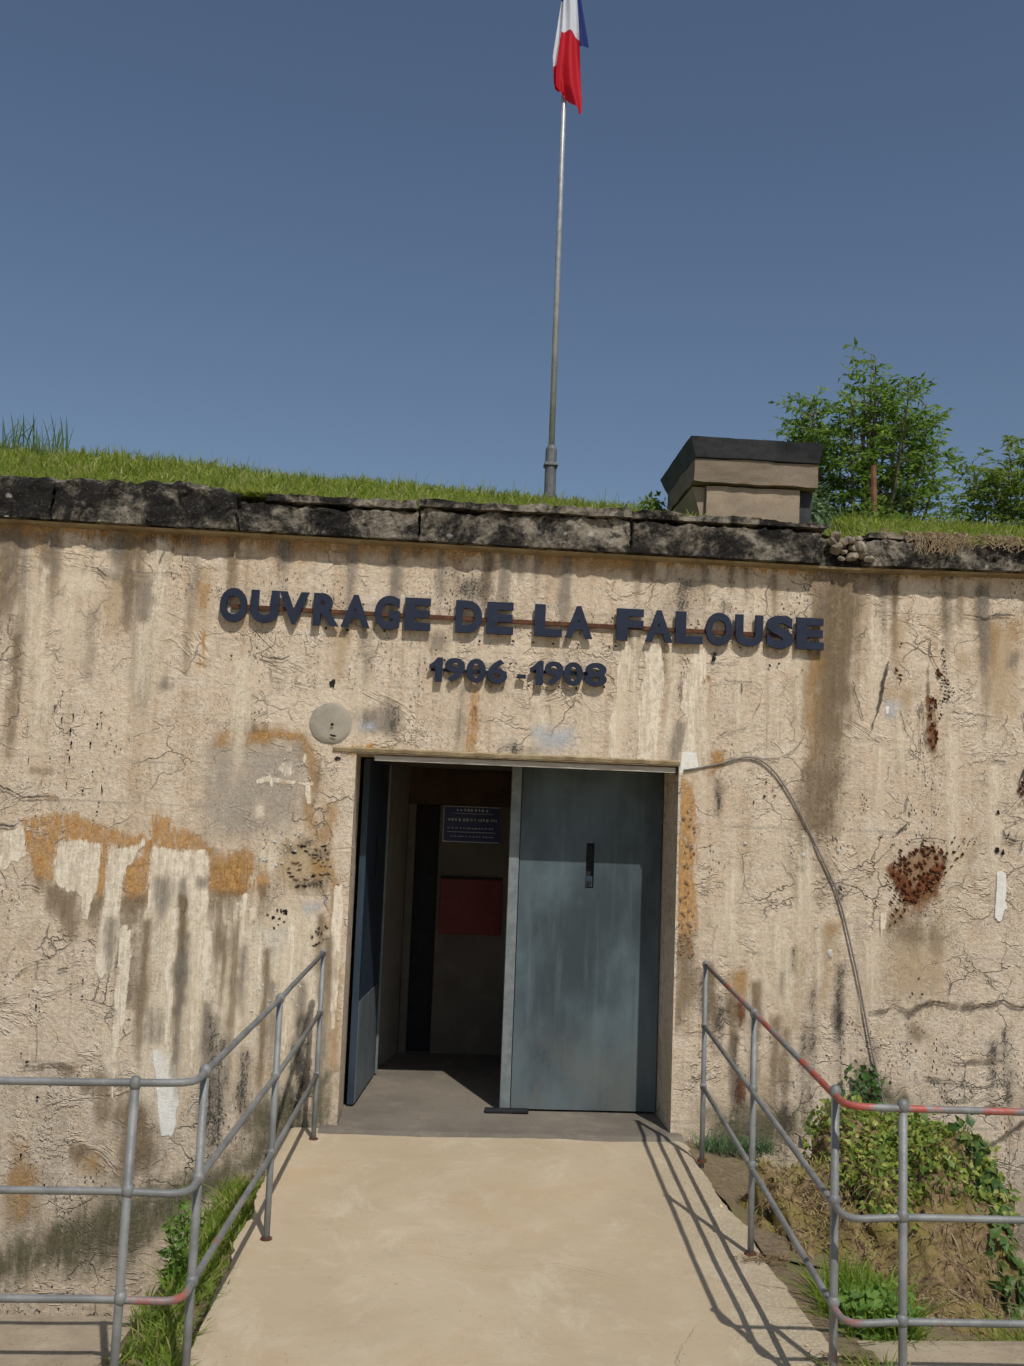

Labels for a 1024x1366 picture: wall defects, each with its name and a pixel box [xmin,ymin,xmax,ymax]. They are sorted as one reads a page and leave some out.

crack [852,611,1012,761]
crack [0,775,61,828]
leakage [0,524,1017,1150]
crack [879,796,946,841]
rust [866,836,976,926]
crack [977,713,1024,851]
crack [0,950,93,1089]
peeling [53,832,332,1136]
crack [869,974,1024,1017]